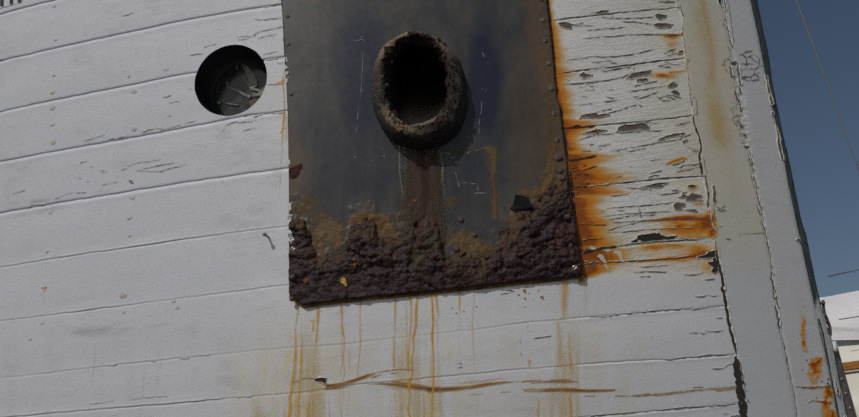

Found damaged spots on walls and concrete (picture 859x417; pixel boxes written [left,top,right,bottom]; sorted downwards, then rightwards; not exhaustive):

peeling [557,21,574,30]
peeling [653,12,674,29]
peeling [626,68,652,83]
peeling [579,112,650,136]
peeling [657,131,688,143]
rust [287,0,718,417]
peeling [639,181,717,212]
crack [547,0,838,417]
rust [800,318,837,417]